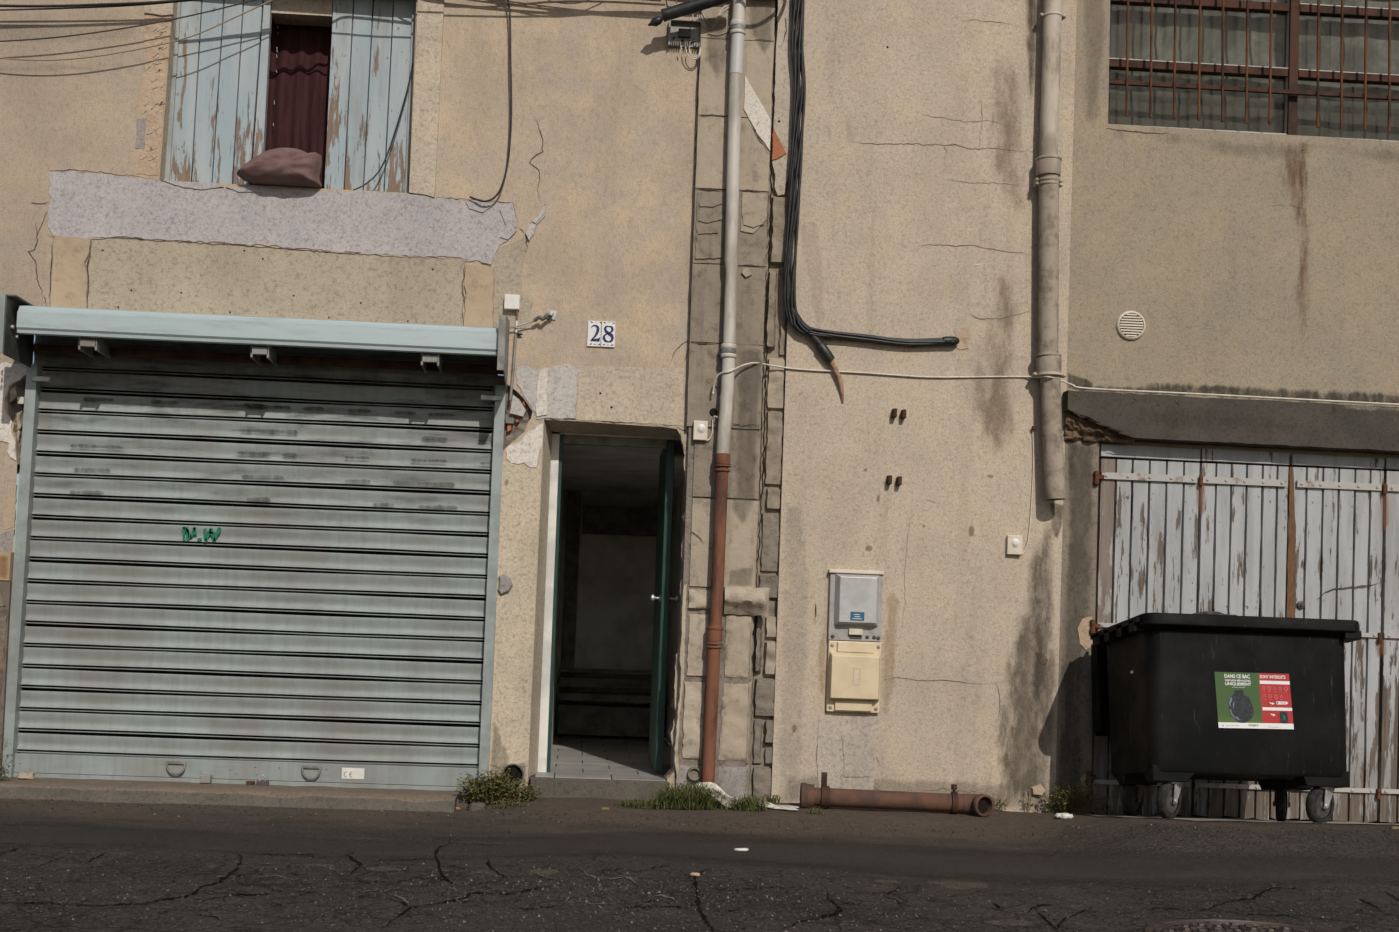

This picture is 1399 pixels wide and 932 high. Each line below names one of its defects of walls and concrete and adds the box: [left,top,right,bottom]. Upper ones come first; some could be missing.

crack [28,169,149,305]
spalling [135,15,278,193]
crack [440,118,546,252]
crack [858,97,1031,186]
spalling [2,376,26,530]
damp [1006,446,1091,805]